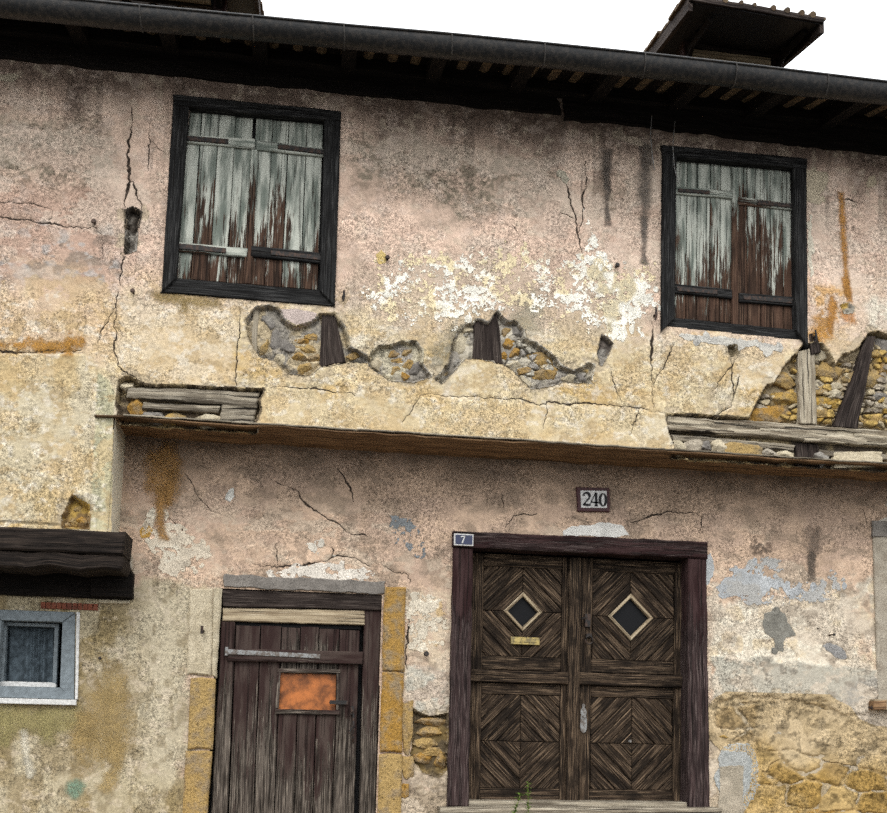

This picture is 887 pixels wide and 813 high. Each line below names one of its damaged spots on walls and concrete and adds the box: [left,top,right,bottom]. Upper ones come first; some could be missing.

crack [0,201,137,379]
crack [124,107,165,229]
flaking render [245,209,660,389]
crack [560,160,588,260]
water stain [602,150,612,225]
water stain [639,143,652,264]
corrosion [815,296,855,340]
corrosion [839,193,852,302]
spalling [665,330,887,473]
corrosion [146,443,181,540]
crack [252,546,411,582]
flaking render [706,553,847,654]